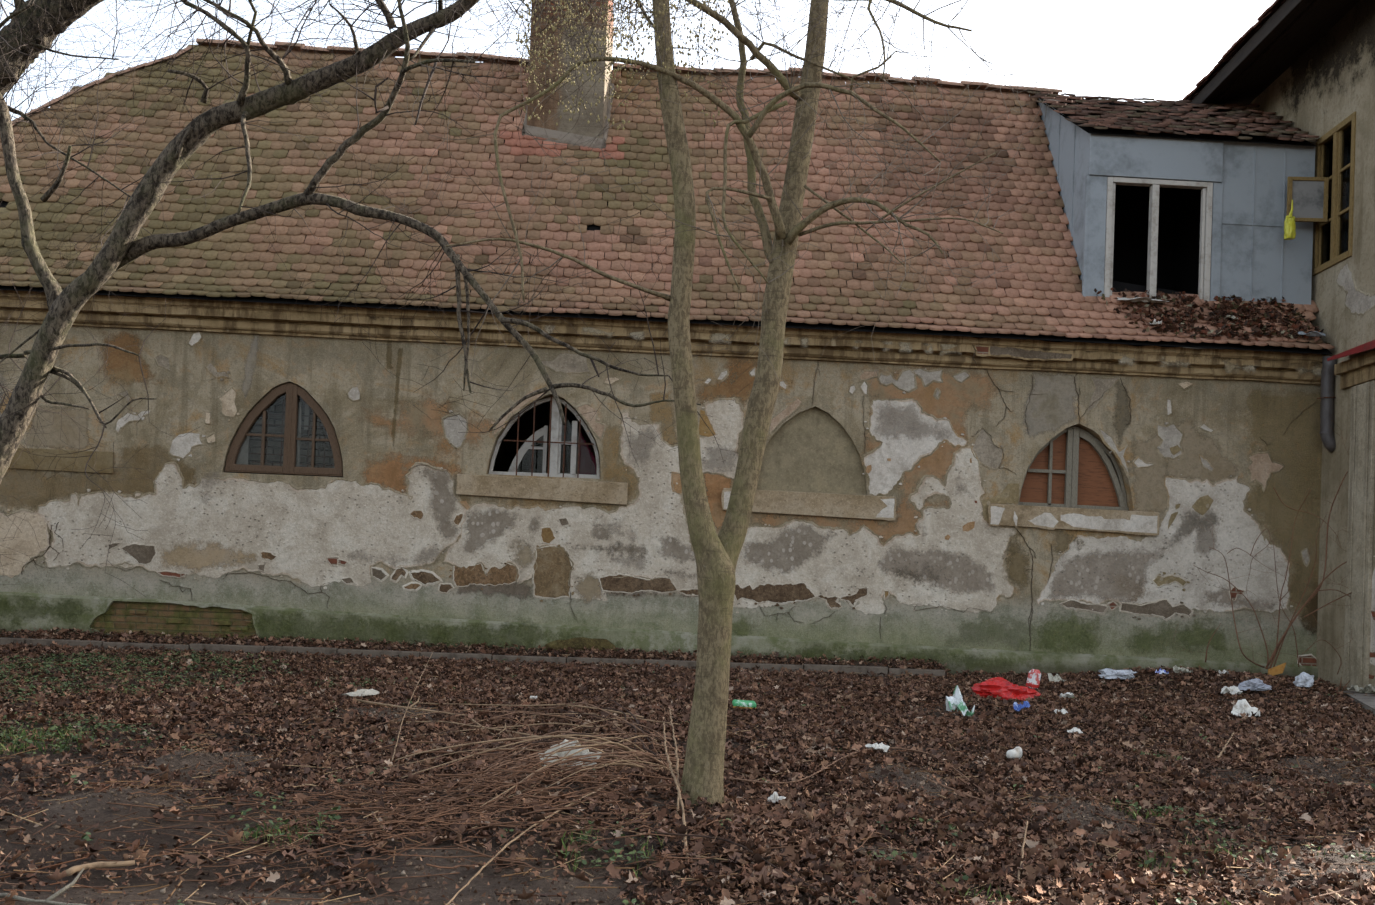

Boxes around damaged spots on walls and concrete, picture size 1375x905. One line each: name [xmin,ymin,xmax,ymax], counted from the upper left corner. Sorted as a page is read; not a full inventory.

peeling [0,384,698,602]
peeling [700,368,746,510]
crack [972,344,1040,469]
peeling [733,367,1310,621]
crack [1074,373,1131,424]
spalling [87,599,260,640]
damp [576,574,657,602]